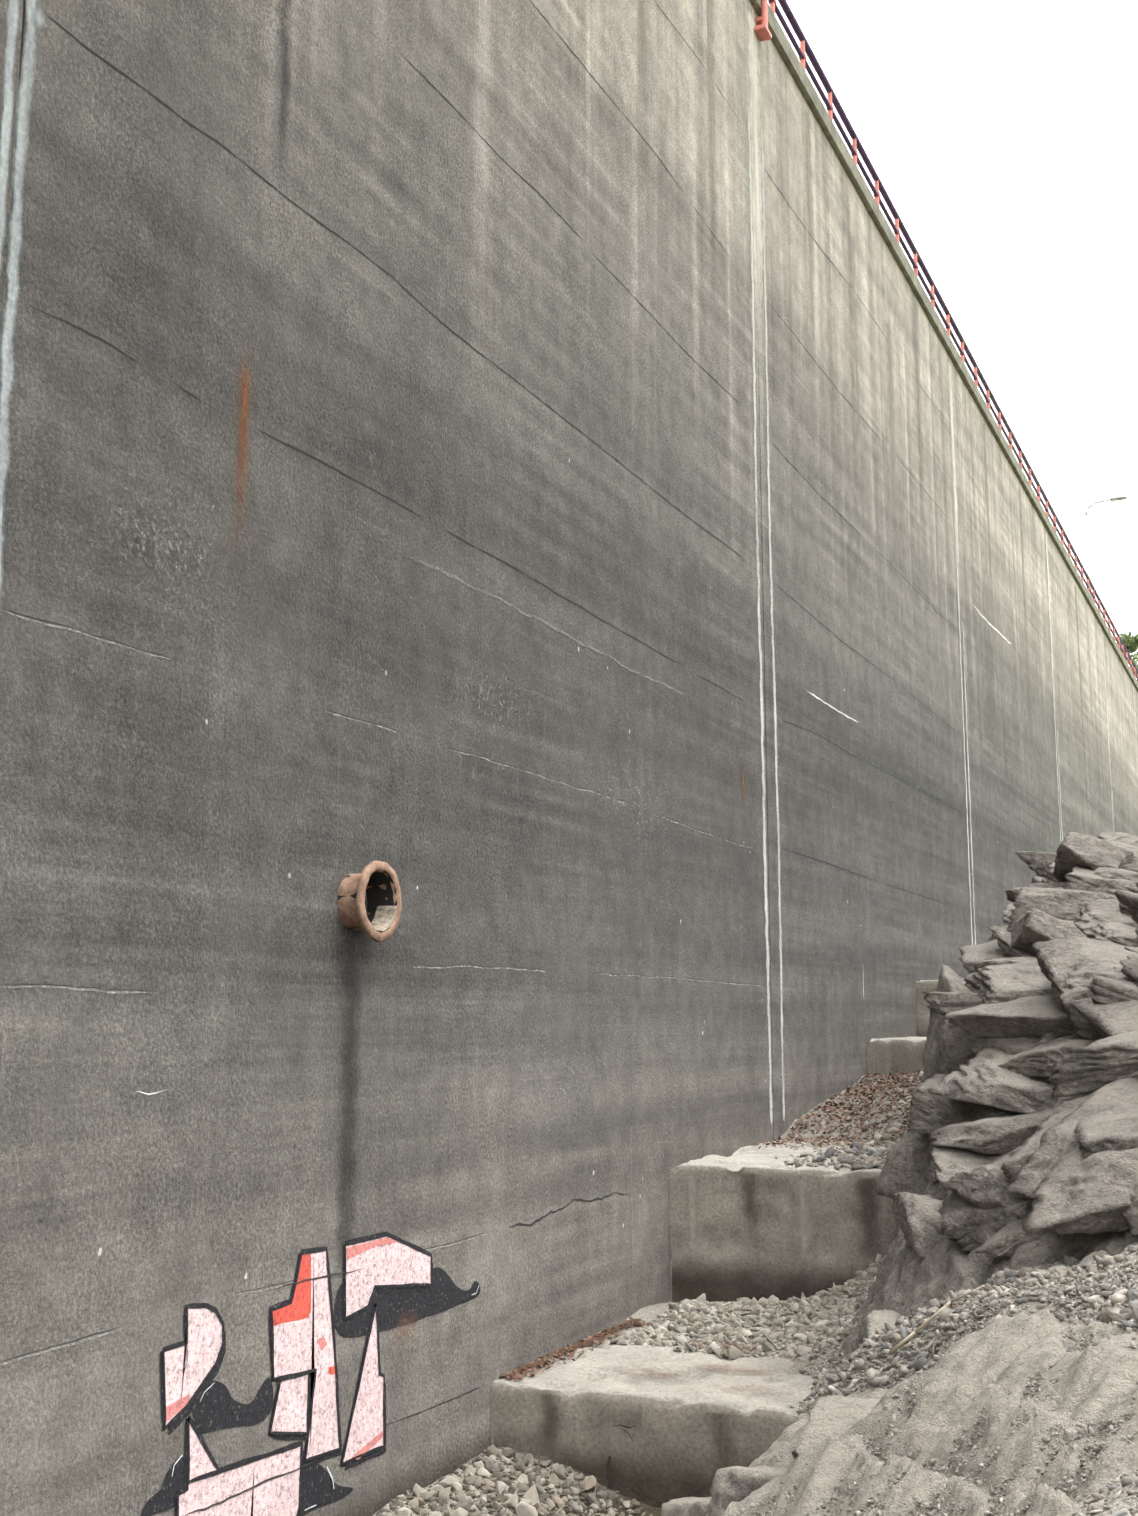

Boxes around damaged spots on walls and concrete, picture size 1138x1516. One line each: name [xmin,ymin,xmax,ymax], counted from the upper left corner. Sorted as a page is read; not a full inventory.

crack [424,1192,629,1250]
crack [0,1324,125,1365]